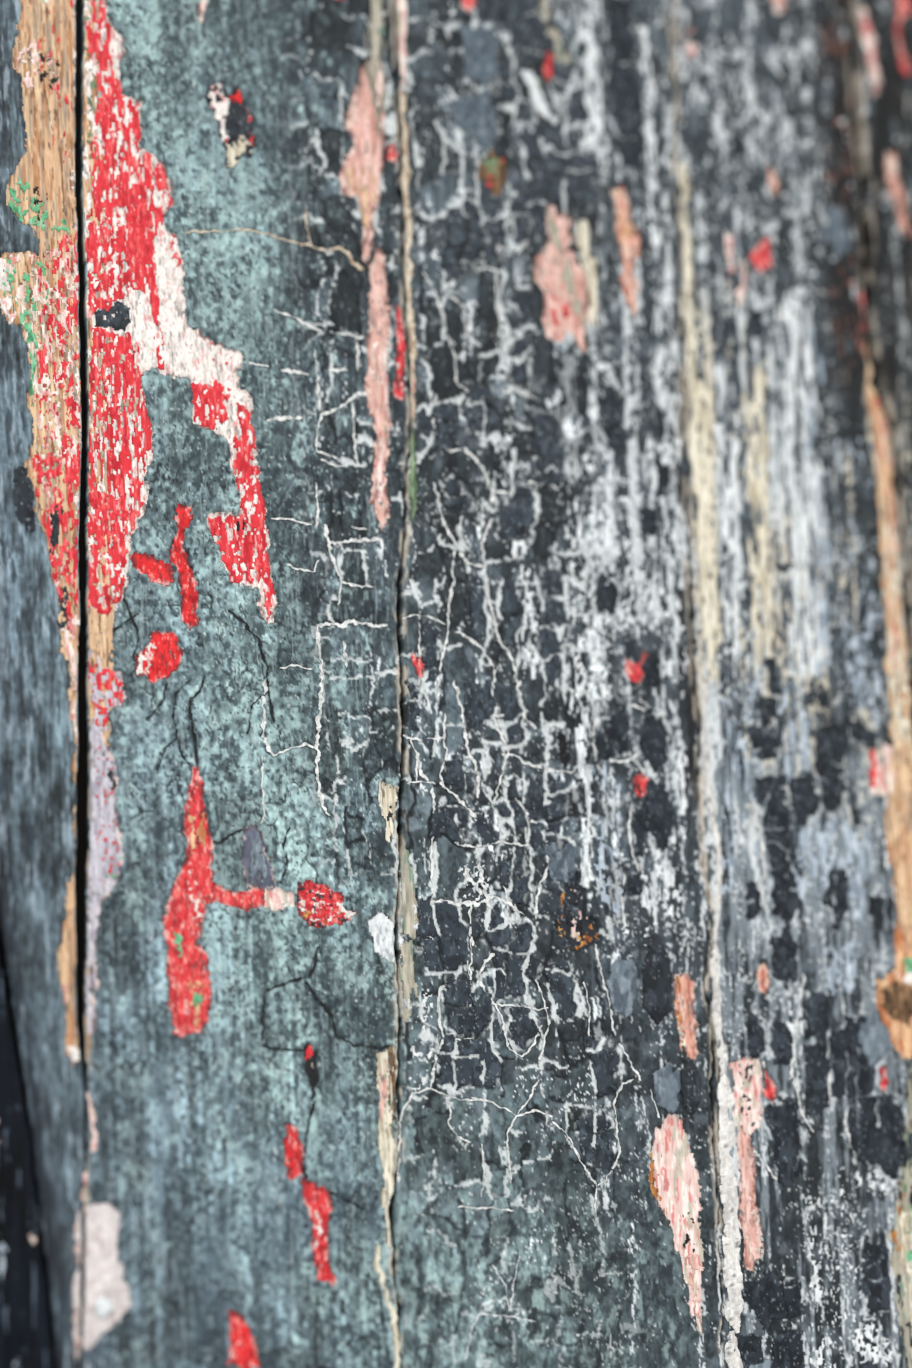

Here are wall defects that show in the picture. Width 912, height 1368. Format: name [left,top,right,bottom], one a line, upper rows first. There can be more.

crack [186,209,365,270]
peeling [0,0,279,1066]
crack [213,217,660,1213]
peeling [339,0,912,1368]
peeling [162,766,357,1038]
crack [750,711,818,912]
crack [763,974,854,1152]
peeling [72,1171,132,1362]
peeling [226,1309,260,1368]
peeling [283,1124,336,1288]
crack [465,1256,536,1362]
crack [737,1147,777,1180]